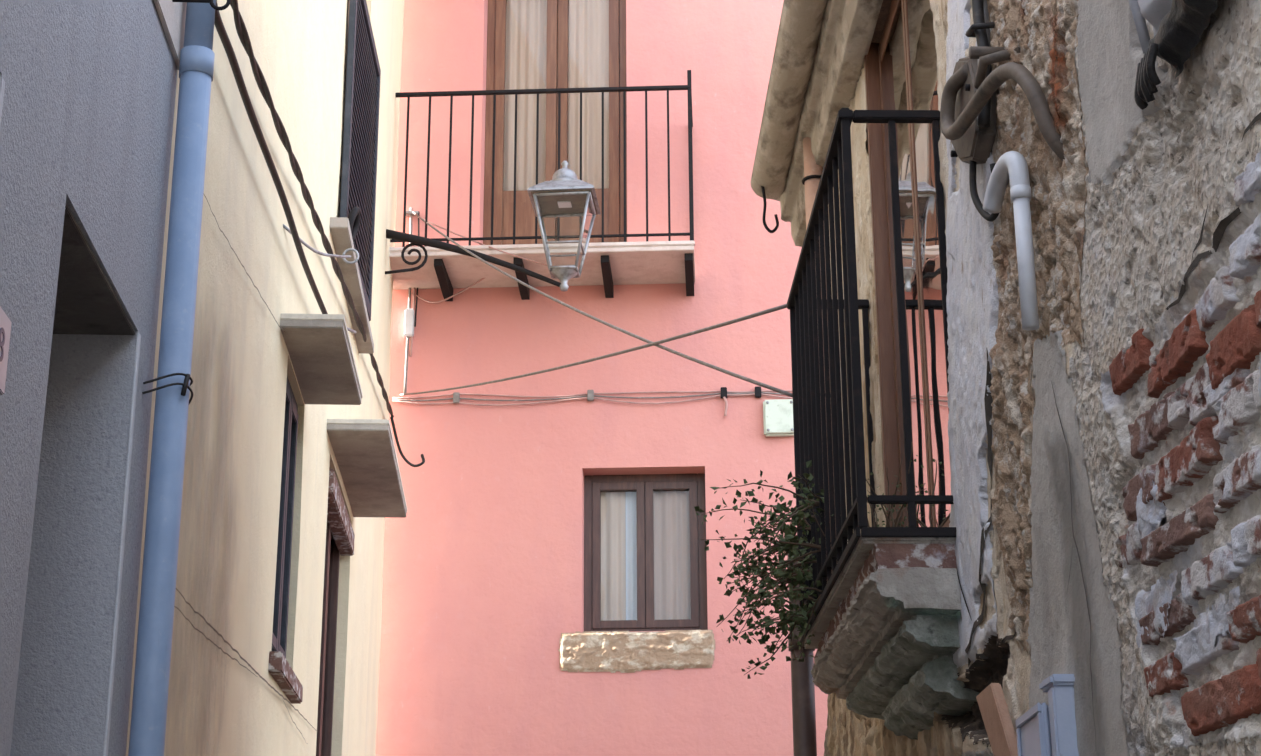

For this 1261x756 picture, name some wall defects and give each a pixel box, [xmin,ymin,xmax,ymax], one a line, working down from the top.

crack [174,588,318,744]
spalling [824,0,1089,756]
spalling [1100,150,1261,749]